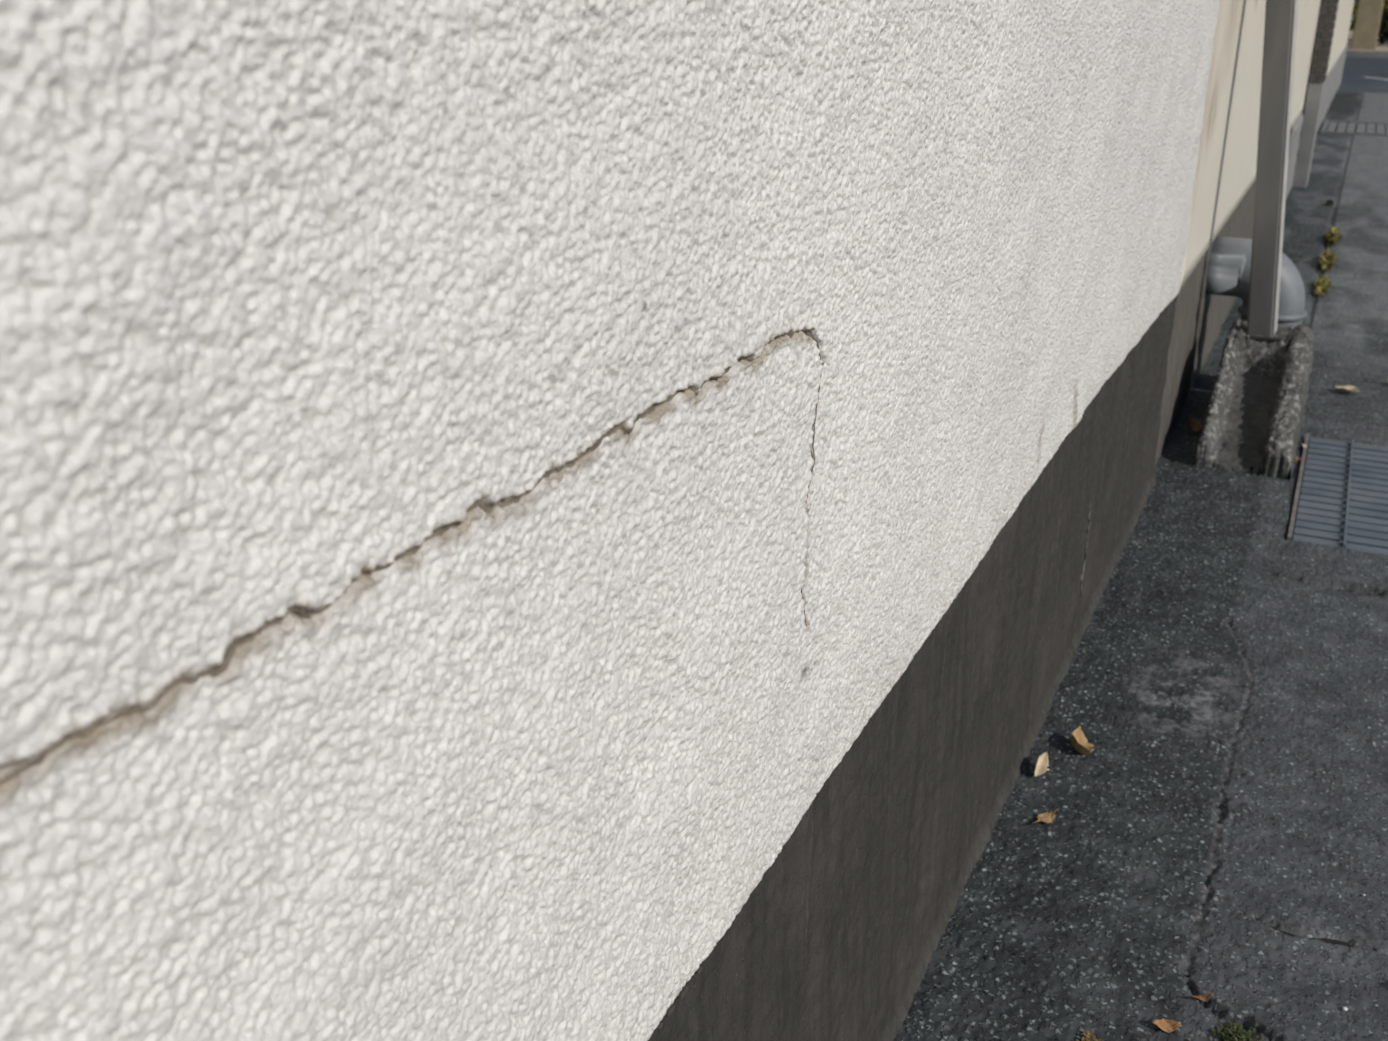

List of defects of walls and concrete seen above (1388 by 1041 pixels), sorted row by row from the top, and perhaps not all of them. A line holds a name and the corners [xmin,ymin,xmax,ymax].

crack [0,329,822,794]